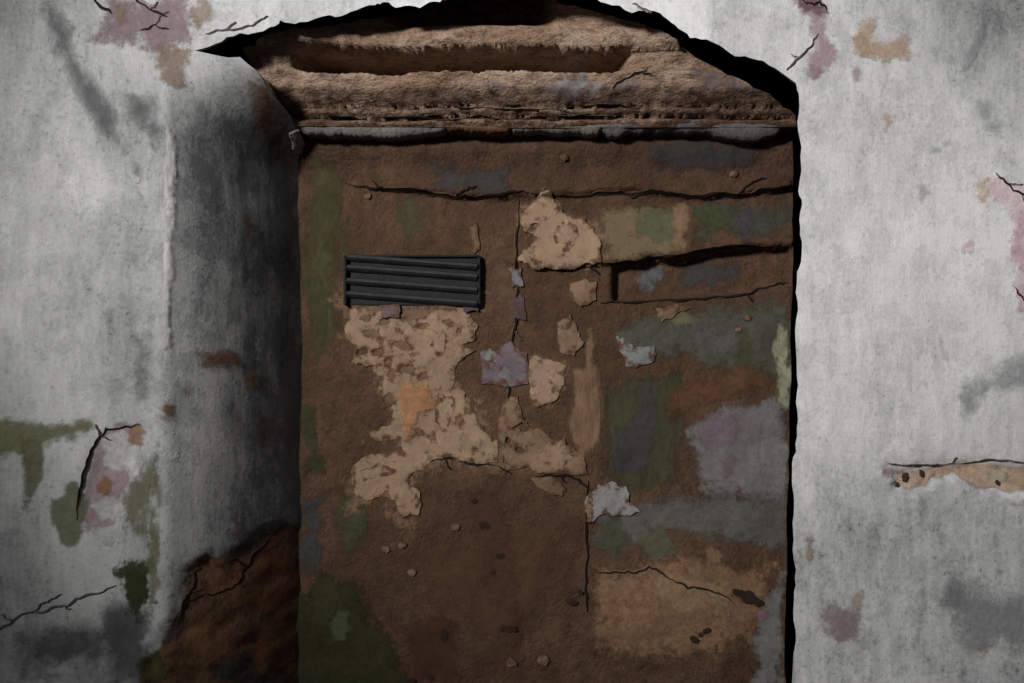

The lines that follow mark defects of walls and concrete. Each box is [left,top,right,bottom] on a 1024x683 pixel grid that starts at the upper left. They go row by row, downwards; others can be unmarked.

crack [94,0,111,13]
crack [135,0,170,31]
crack [787,0,827,68]
flaking render [508,182,608,322]
crack [346,177,790,344]
flaking render [616,336,656,368]
flaking render [327,290,588,536]
crack [76,424,137,520]
flaking render [585,481,640,523]
crack [537,473,736,615]
flaking render [882,463,1024,505]
flaking render [156,524,300,683]